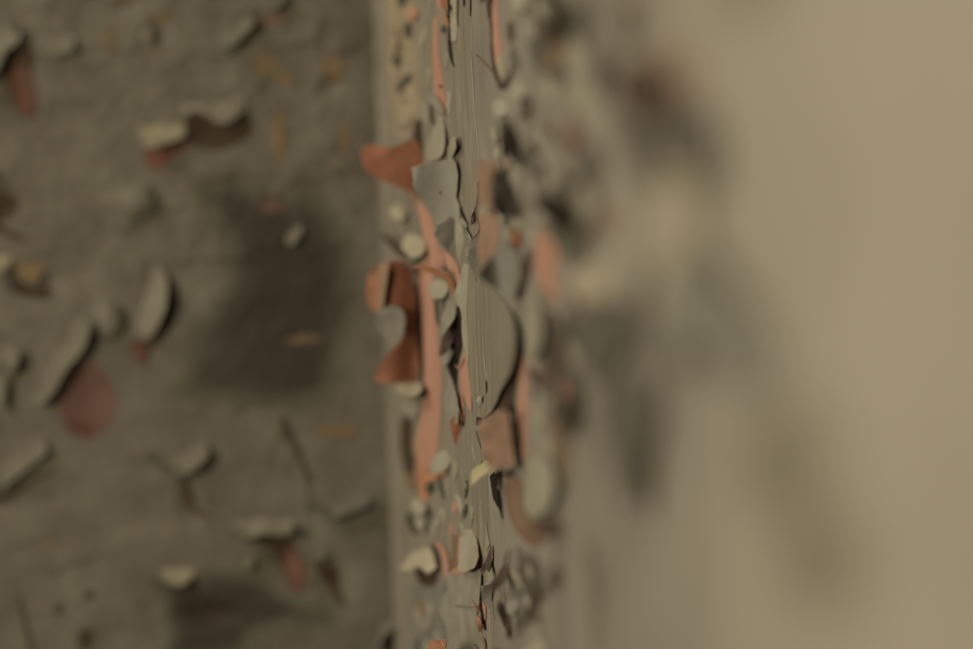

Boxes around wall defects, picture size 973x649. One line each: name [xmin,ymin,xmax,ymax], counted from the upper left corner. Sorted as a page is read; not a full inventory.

peeling [215,14,255,49]
peeling [0,22,75,120]
peeling [138,98,254,171]
peeling [0,255,55,299]
peeling [129,264,176,365]
peeling [361,0,677,649]
peeling [0,347,20,416]
peeling [27,317,117,438]
peeling [0,437,56,504]
peeling [147,443,211,517]
peeling [233,518,296,567]
peeling [161,567,239,647]